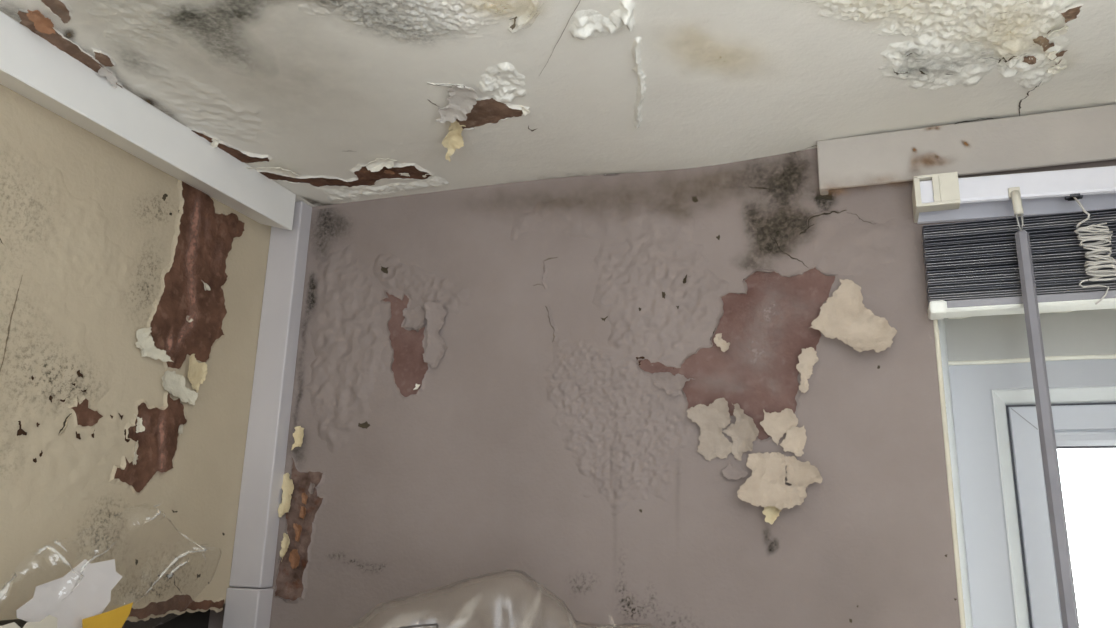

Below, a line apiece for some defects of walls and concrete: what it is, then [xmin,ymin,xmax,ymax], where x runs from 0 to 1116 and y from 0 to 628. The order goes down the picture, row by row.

flaking render [14,0,126,89]
mould [174,5,250,34]
flaking render [568,8,624,40]
peeling [436,62,530,162]
flaking render [188,127,436,188]
leakage [749,210,806,253]
leakage [814,192,834,211]
flaking render [49,180,245,495]
peeling [380,289,448,401]
peeling [635,264,897,524]
flaking render [274,426,327,604]